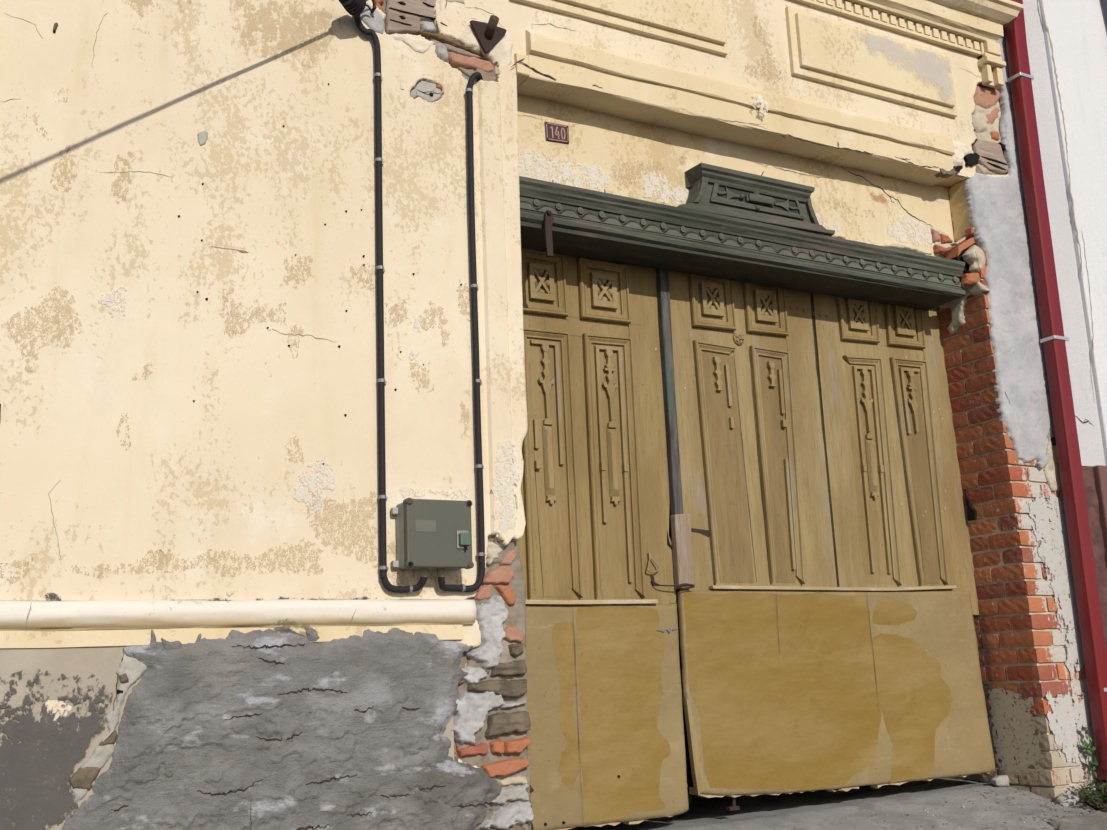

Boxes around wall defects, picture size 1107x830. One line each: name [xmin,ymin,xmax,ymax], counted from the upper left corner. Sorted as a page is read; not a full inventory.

peeling [230,0,341,65]
spalling [366,0,495,79]
spalling [401,81,442,103]
crack [673,107,938,225]
spalling [935,86,1009,178]
peeling [293,458,335,520]
peeling [1034,418,1062,492]
spalling [450,440,534,830]